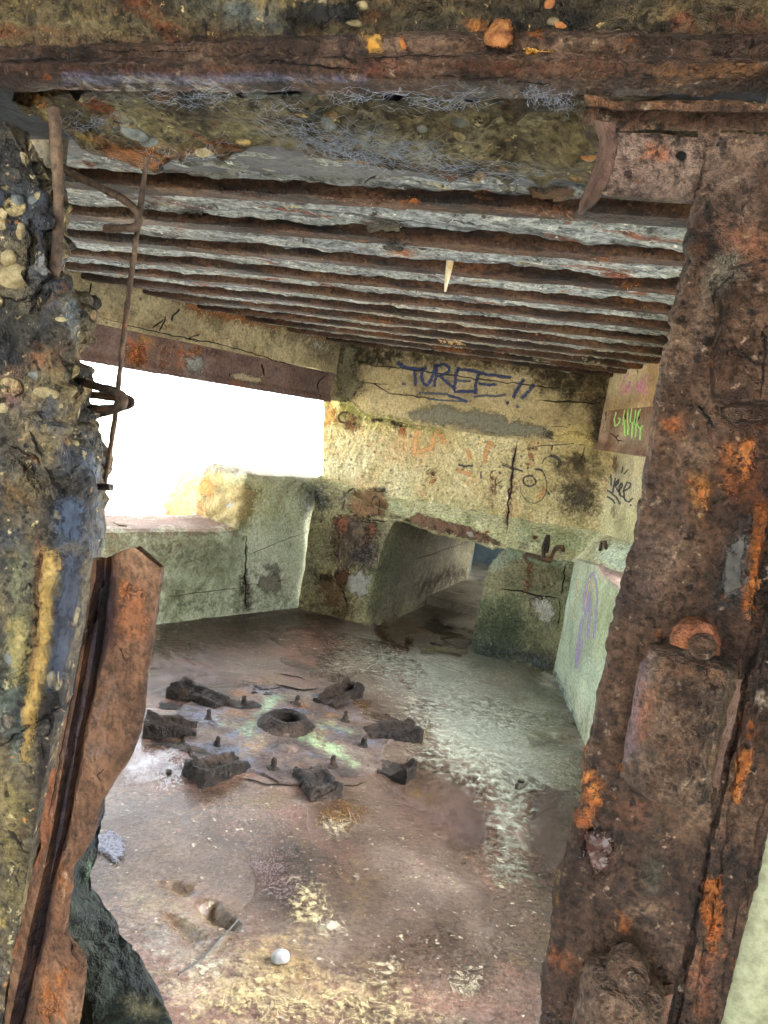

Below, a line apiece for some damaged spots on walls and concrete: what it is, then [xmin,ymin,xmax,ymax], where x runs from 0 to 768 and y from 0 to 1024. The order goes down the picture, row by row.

rust [362,33,381,53]
rust [483,17,514,49]
rust [99,145,155,166]
crack [365,363,624,533]
water stain [572,453,585,471]
rust [720,439,754,485]
water stain [564,484,593,511]
crack [166,532,303,601]
rust [5,551,62,761]
rust [572,747,601,829]
rust [732,749,754,803]
rust [704,880,725,953]